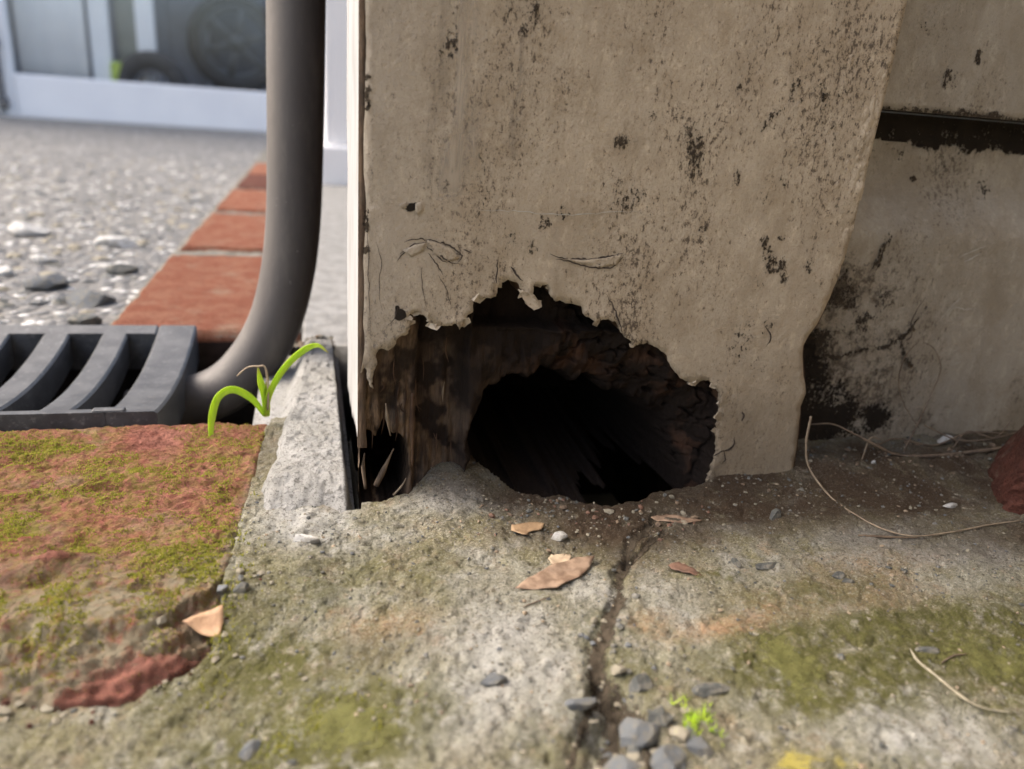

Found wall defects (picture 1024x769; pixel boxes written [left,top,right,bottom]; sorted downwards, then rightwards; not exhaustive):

water stain [750,235,787,290]
peeling [395,306,441,330]
peeling [518,284,542,310]
water stain [798,233,927,441]
peeling [687,381,724,434]
crack [565,509,670,769]